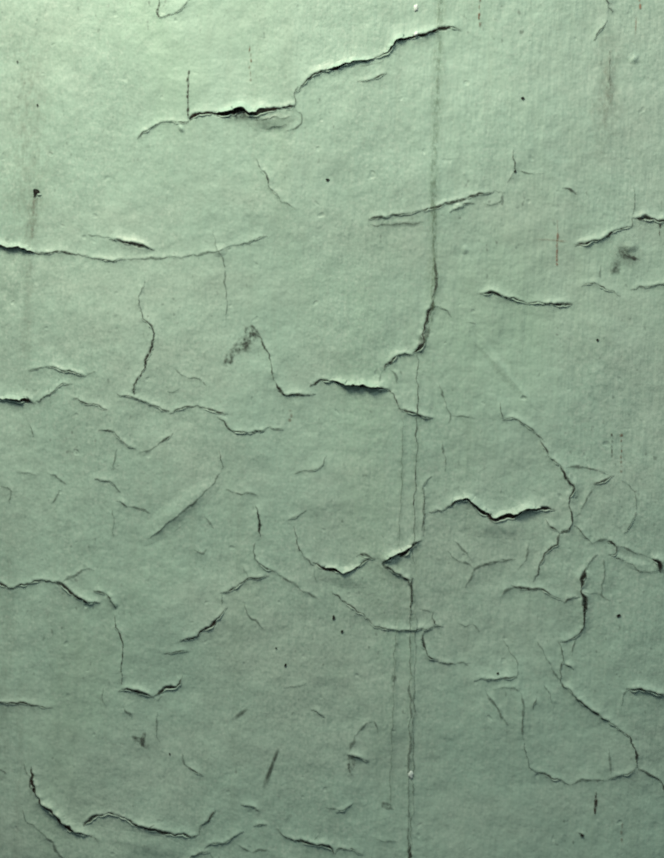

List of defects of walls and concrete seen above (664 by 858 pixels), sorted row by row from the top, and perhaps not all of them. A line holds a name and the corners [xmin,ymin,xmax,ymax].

crack [0,235,267,310]
crack [0,281,280,515]
crack [0,570,183,714]
crack [164,493,288,654]
crack [259,258,664,858]
crack [1,764,361,858]